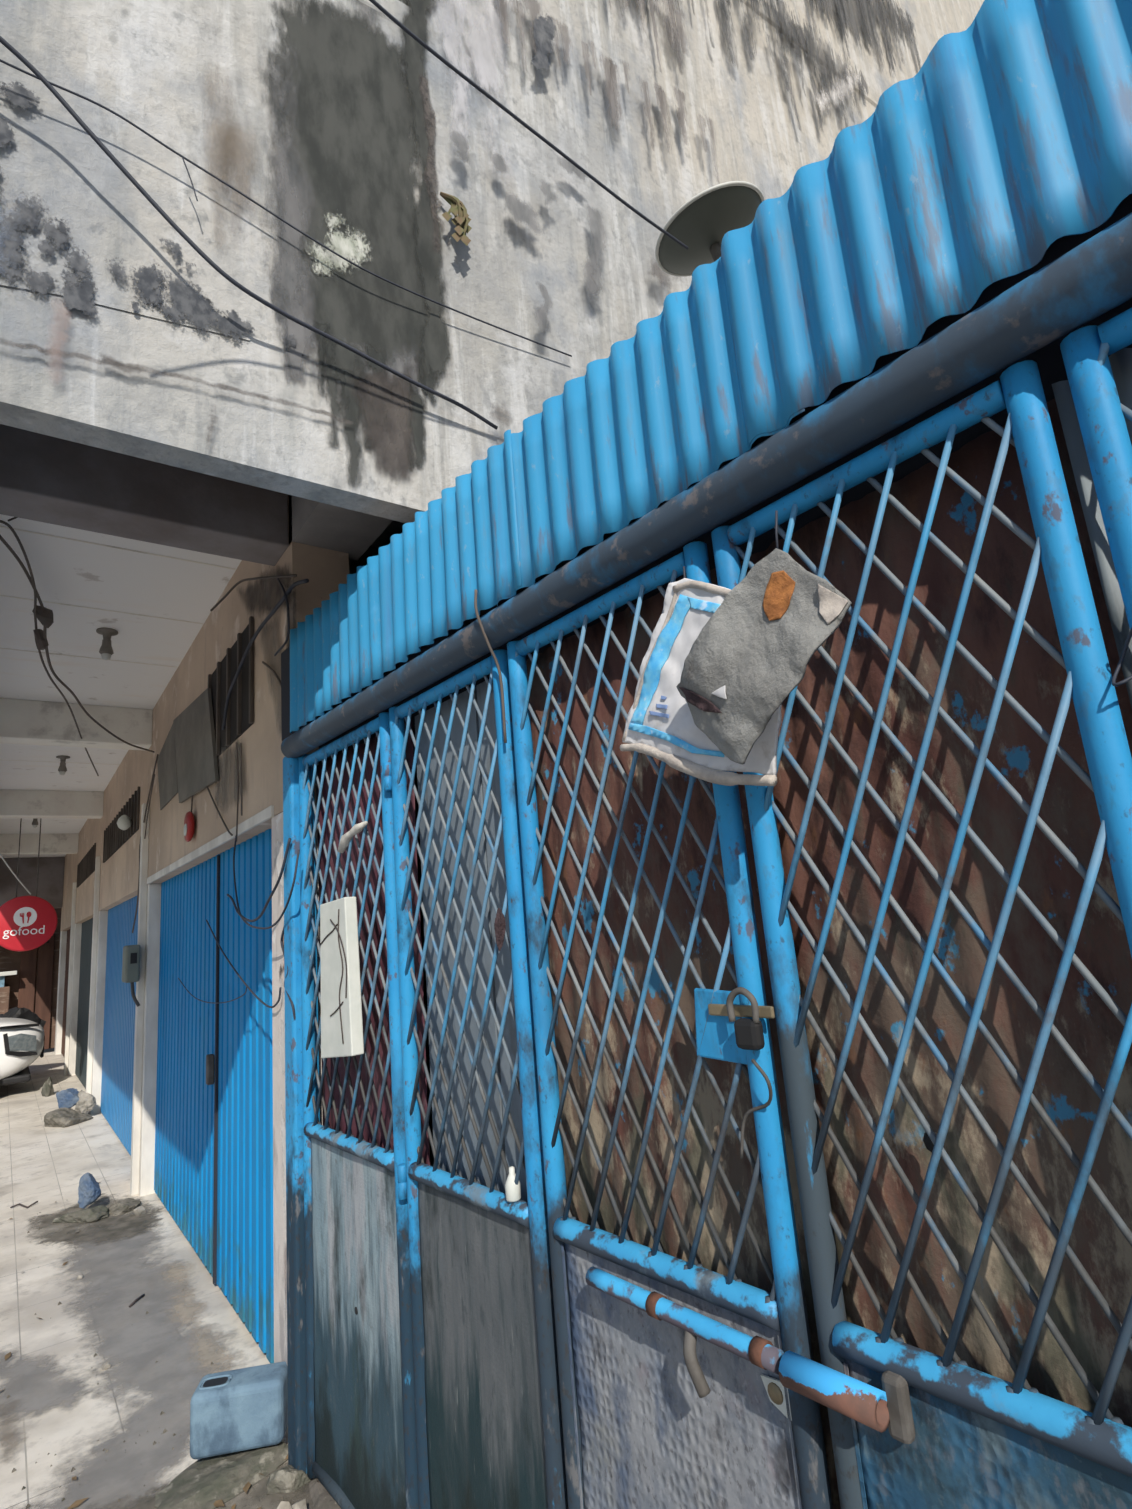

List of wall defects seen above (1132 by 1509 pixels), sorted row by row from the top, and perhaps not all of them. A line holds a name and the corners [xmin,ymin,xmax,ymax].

damp [0,81,40,147]
damp [446,0,921,182]
damp [505,181,557,233]
damp [264,0,444,485]
damp [584,206,605,294]
damp [60,269,98,318]
damp [535,284,552,331]
corrosion [763,570,796,621]